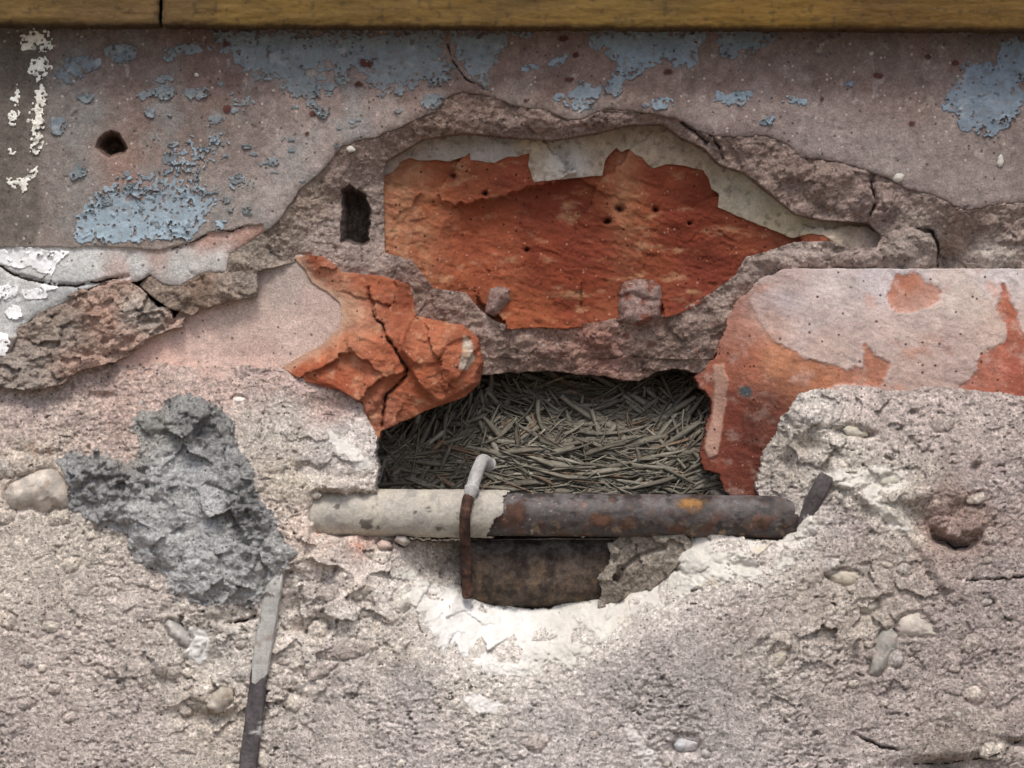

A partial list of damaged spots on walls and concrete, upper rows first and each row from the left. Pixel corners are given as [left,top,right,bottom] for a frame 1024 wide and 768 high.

crack [683,123,720,150]
spalling [0,28,1024,390]
crack [916,228,940,267]
crack [368,293,408,424]
rust [507,499,526,525]
rust [679,499,702,510]